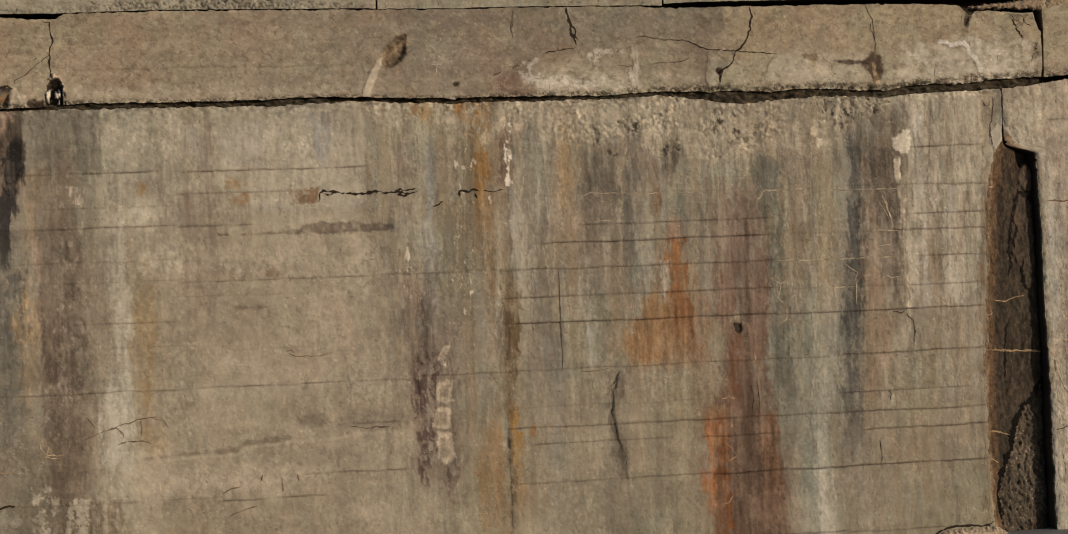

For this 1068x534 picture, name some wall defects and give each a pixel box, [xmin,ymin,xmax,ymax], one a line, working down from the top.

efflorescence [496,44,642,97]
crack [614,7,774,90]
corrosion [800,49,887,84]
leakage [0,111,139,534]
peeling [216,184,407,237]
crack [319,188,502,207]
corrosion [468,132,538,534]
crack [558,269,627,465]
corrosion [620,160,792,534]
spalling [359,12,1068,532]